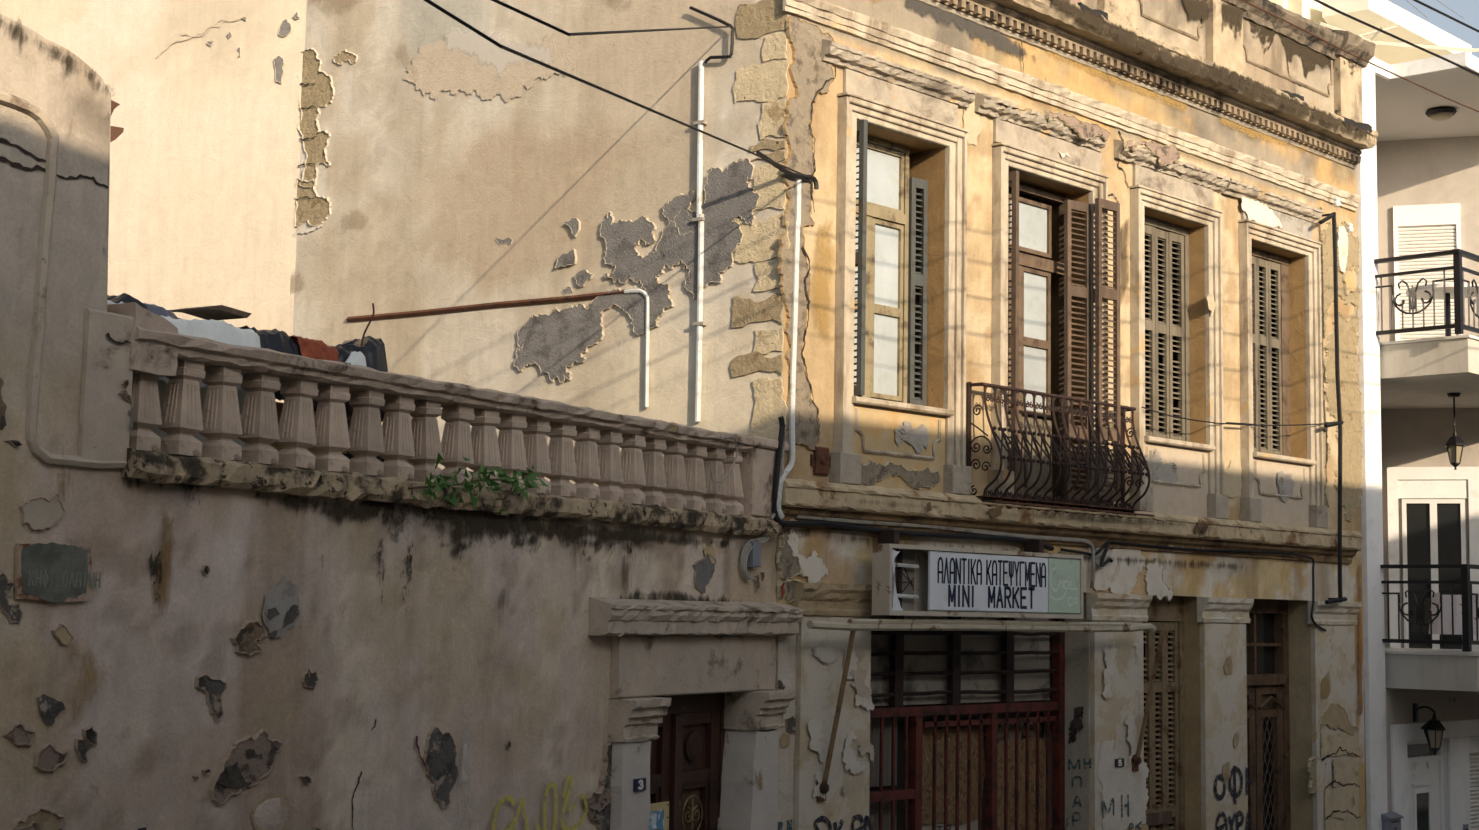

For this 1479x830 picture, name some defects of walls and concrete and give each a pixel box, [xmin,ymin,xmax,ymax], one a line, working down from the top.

spalling [278,12,300,38]
water stain [1053,0,1373,138]
spalling [273,47,358,228]
peeling [514,158,760,383]
spalling [777,16,835,451]
water stain [148,552,162,604]
water stain [256,492,729,612]
spalling [194,673,227,723]
spalling [192,728,283,806]
peeling [422,726,459,810]
spalling [584,742,613,830]
spalling [1307,703,1360,830]